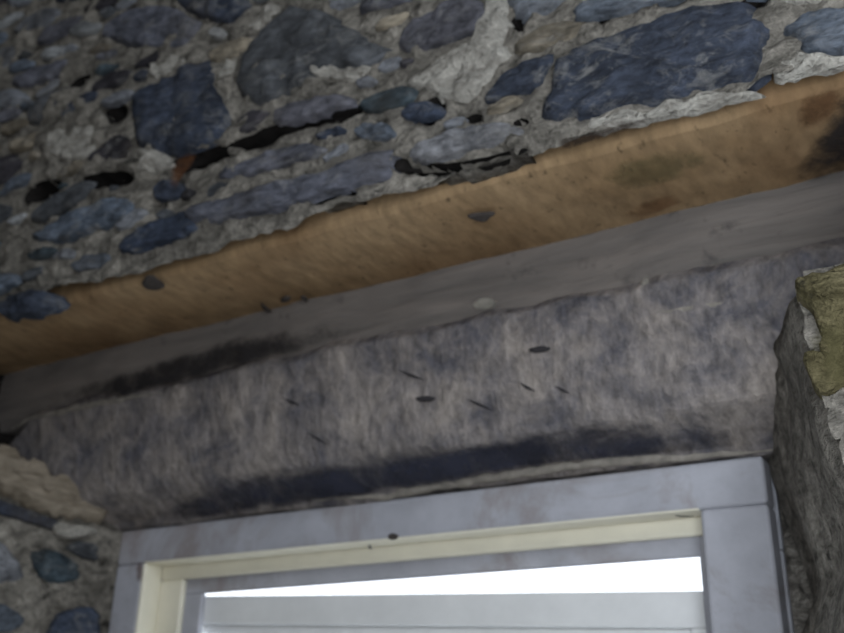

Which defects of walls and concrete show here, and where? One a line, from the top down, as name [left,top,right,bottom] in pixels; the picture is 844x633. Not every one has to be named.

spalling [0,432,16,445]
damp [180,427,663,517]